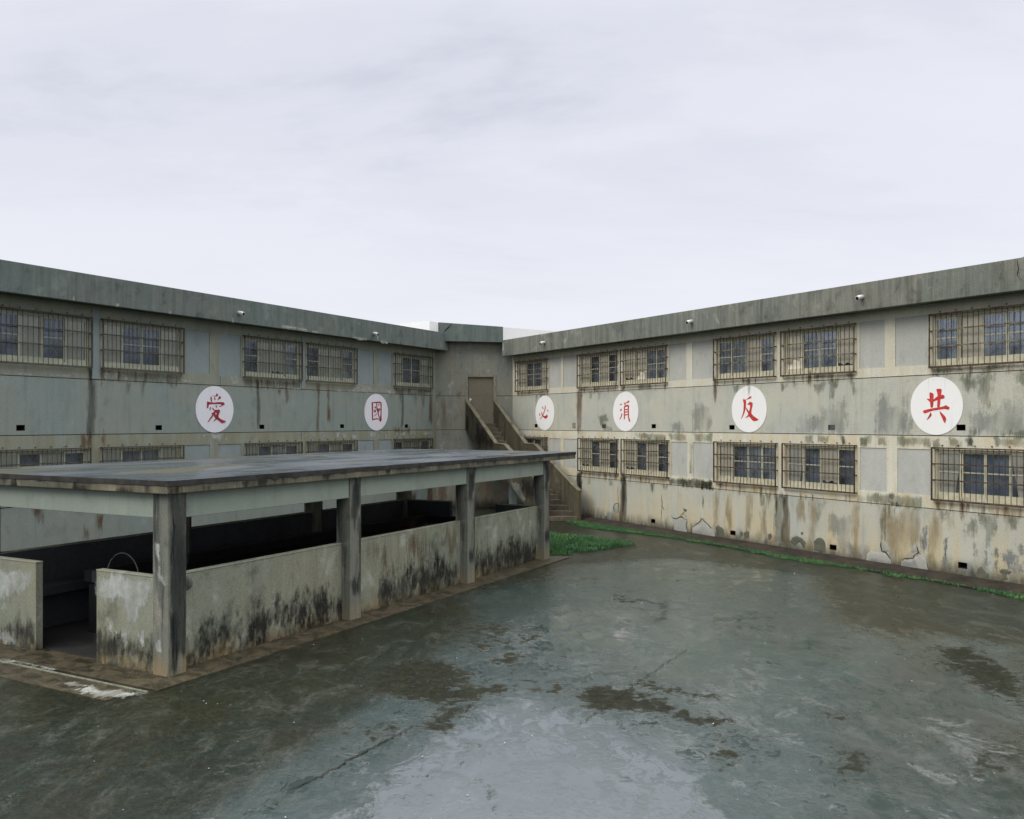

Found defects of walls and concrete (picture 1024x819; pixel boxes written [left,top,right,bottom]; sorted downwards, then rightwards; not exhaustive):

peeling [671,508,688,532]
water stain [775,497,788,542]
peeling [866,527,929,570]
water stain [0,622,34,644]
water stain [95,630,153,663]
water stain [170,586,342,673]
crack [261,729,407,809]